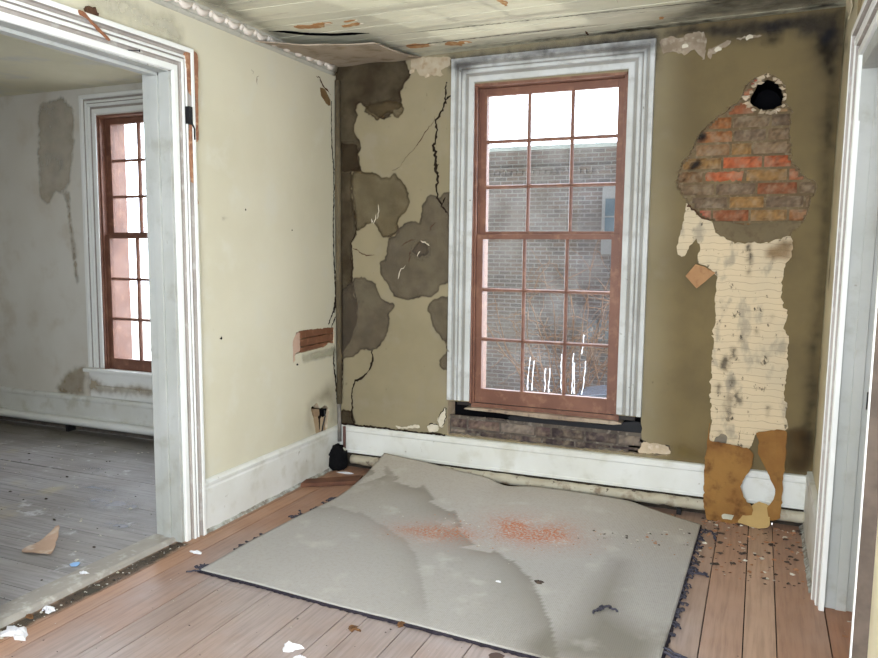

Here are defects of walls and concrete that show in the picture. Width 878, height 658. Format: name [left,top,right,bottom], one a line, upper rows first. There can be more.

peeling [294,20,364,29]
leakage [454,62,470,71]
leakage [588,26,659,52]
flaking render [659,31,762,60]
leakage [678,0,847,74]
leakage [38,99,73,203]
crack [392,82,451,216]
flaking render [675,74,817,243]
crack [328,101,371,328]
spalling [293,327,333,365]
crack [333,349,445,436]